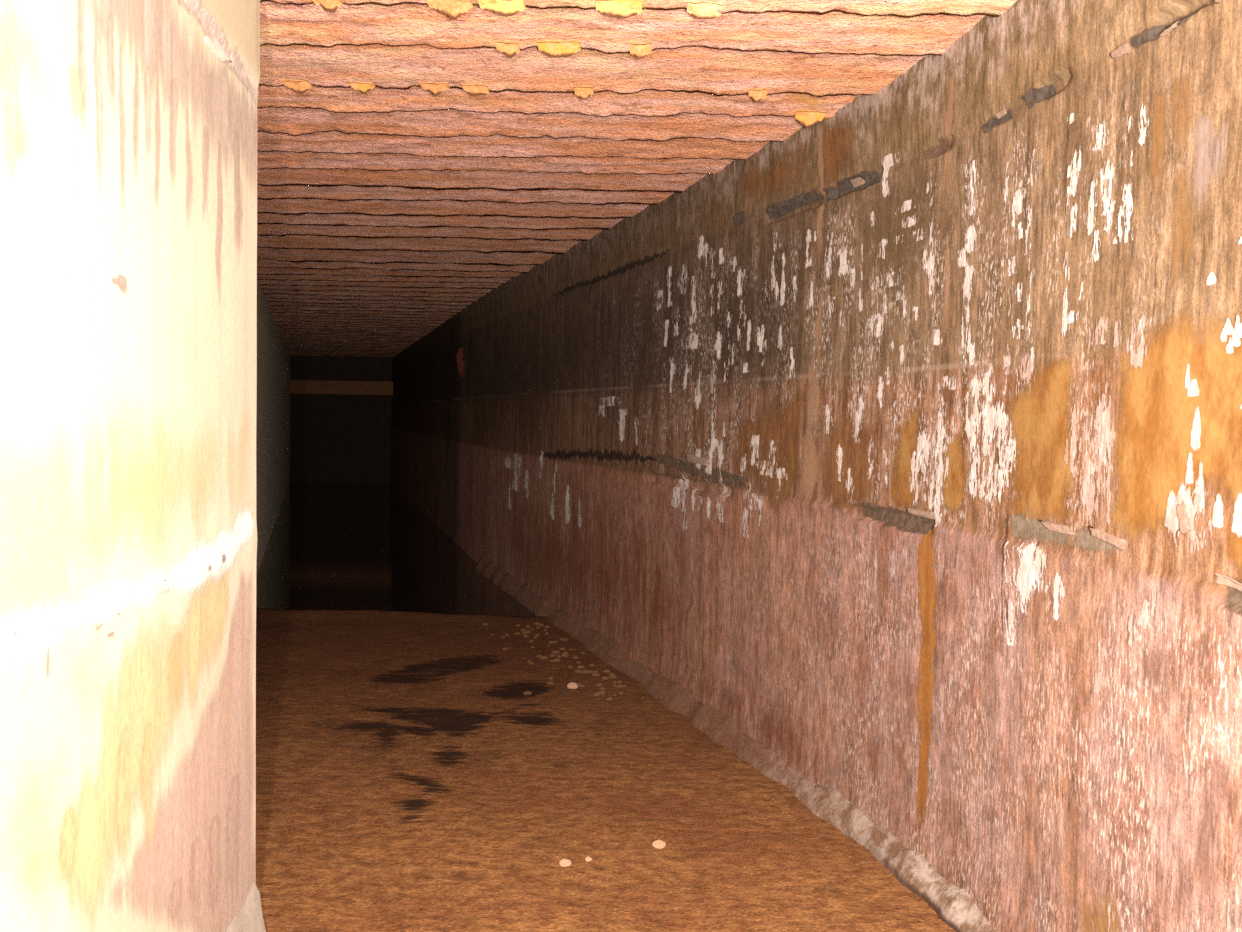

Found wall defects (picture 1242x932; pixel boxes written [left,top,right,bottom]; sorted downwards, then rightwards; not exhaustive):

leakage [71,0,257,277]
efflorescence [1066,124,1133,264]
leakage [657,181,936,538]
efflorescence [908,148,1038,527]
leakage [1220,315,1242,354]
crack [542,449,656,463]
efflorescence [1063,393,1115,525]
efflorescence [1165,365,1242,537]
crack [0,508,254,678]
rust [917,523,937,819]
crack [1000,522,1008,629]
efflorescence [1003,541,1065,647]